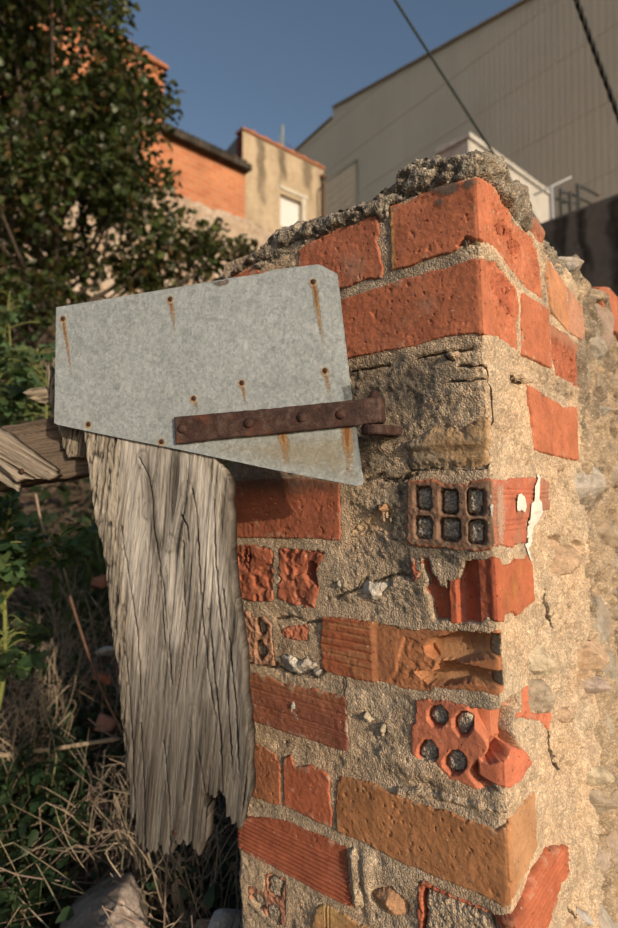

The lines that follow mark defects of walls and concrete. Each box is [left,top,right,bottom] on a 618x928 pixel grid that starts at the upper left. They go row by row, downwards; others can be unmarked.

water stain [554,209,591,271]